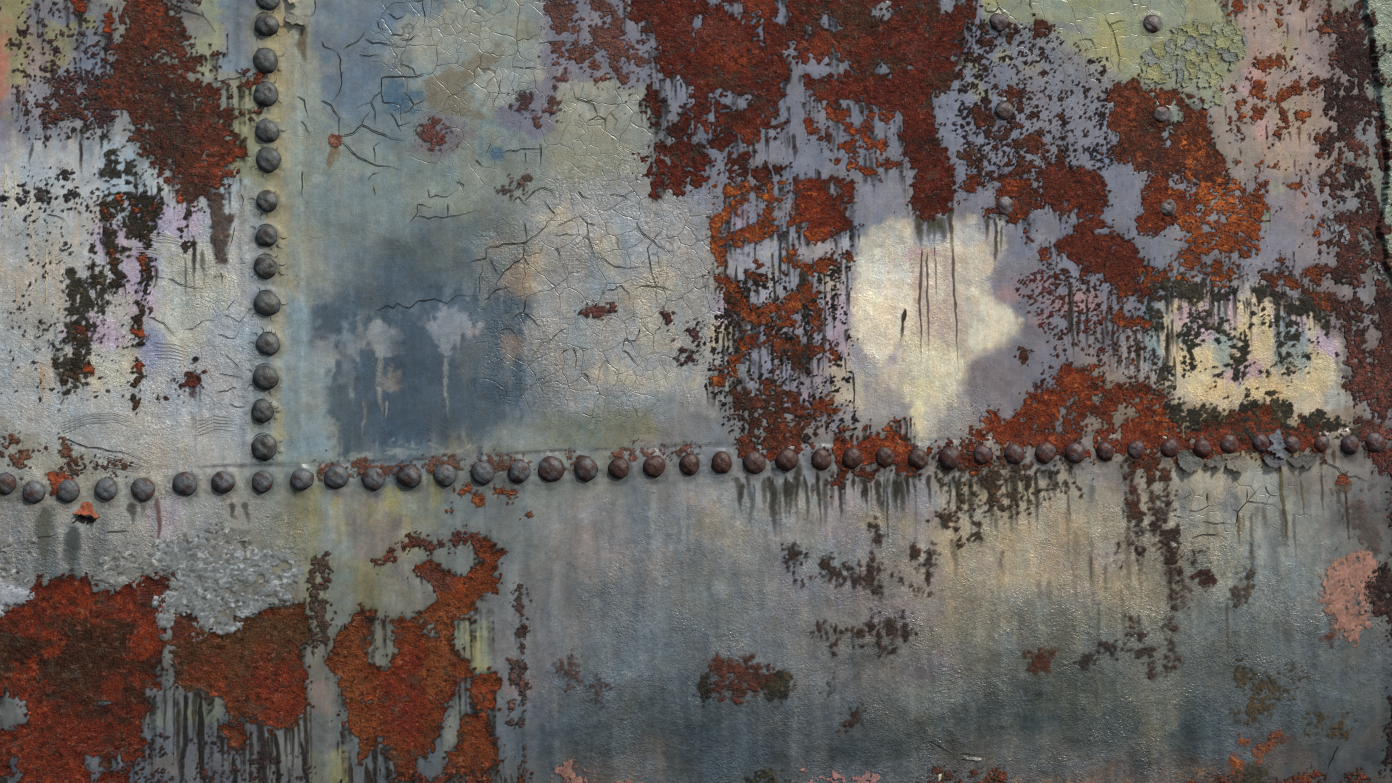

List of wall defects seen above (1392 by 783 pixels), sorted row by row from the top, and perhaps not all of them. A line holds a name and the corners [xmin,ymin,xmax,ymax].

crack [493,41,572,106]
crack [573,87,618,131]
peeling [1140,18,1248,109]
corrosion [0,0,267,414]
crack [377,143,674,379]
water stain [362,357,388,428]
corrosion [507,0,1392,697]
peeling [0,537,38,618]
peeling [82,521,304,641]
corrosion [0,440,535,783]
corrosion [698,652,796,707]
peeling [800,767,880,783]